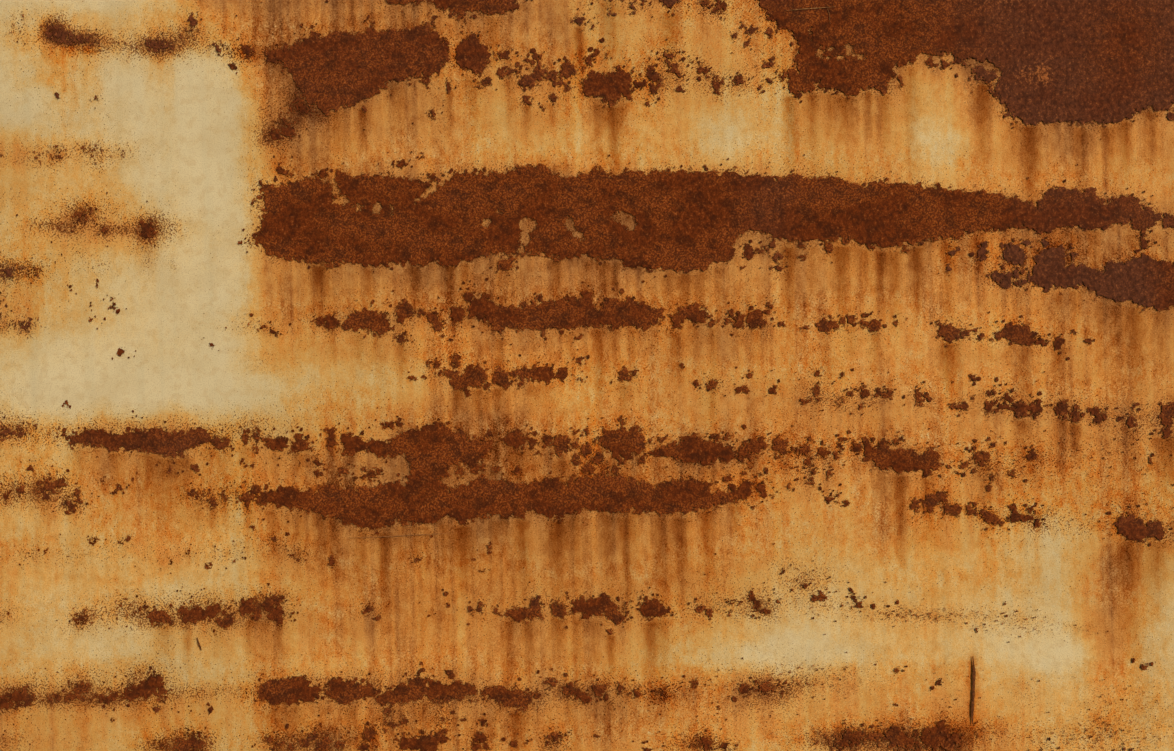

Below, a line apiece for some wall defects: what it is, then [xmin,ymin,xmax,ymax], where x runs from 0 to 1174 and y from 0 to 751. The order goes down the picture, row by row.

rust [0,124,198,365]